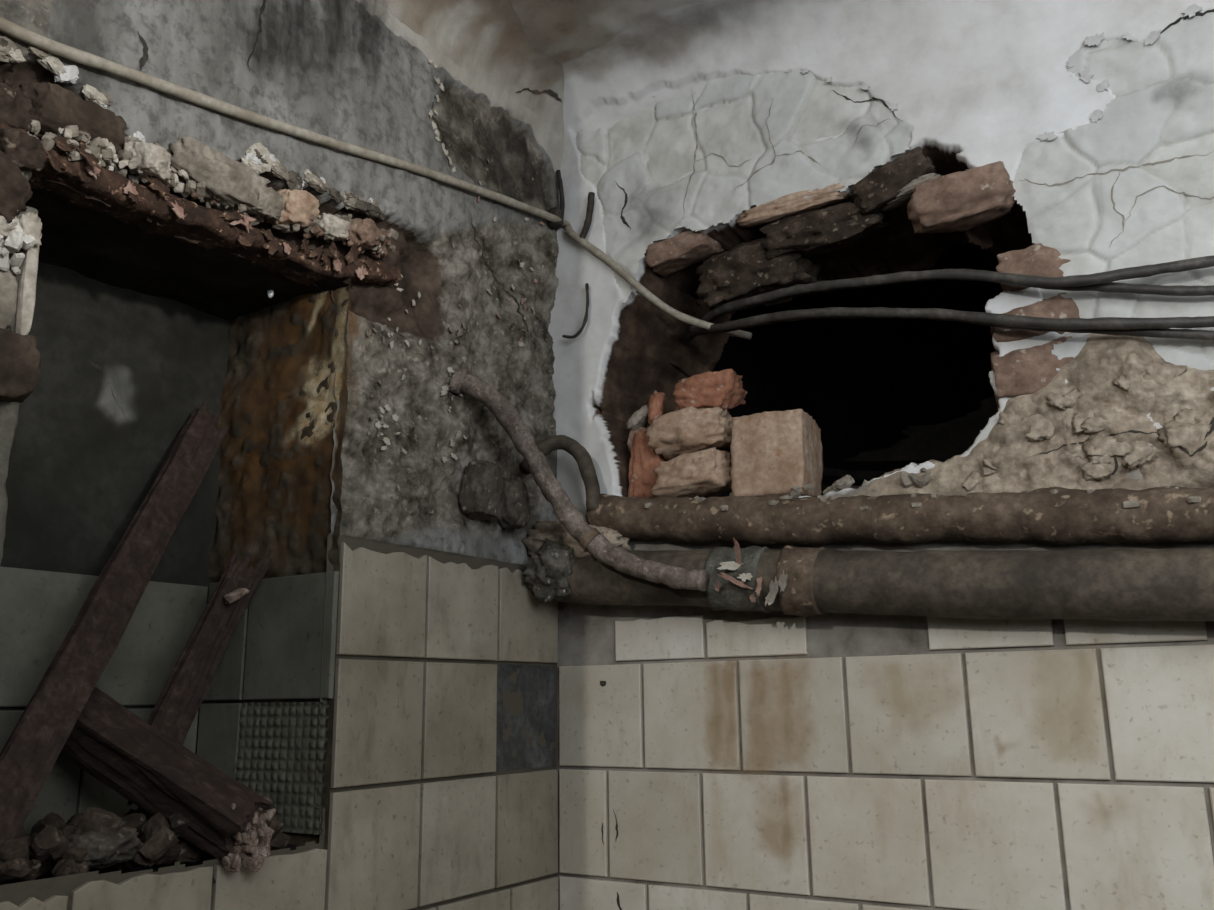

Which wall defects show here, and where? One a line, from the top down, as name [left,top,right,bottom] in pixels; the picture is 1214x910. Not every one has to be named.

damp [256,0,311,64]
crack [1152,9,1214,45]
peeling [0,36,111,109]
peeling [128,131,146,143]
peeling [241,142,385,221]
crack [617,184,631,229]
peeling [576,68,914,303]
crack [682,90,820,220]
crack [832,90,900,147]
crack [1019,152,1214,246]